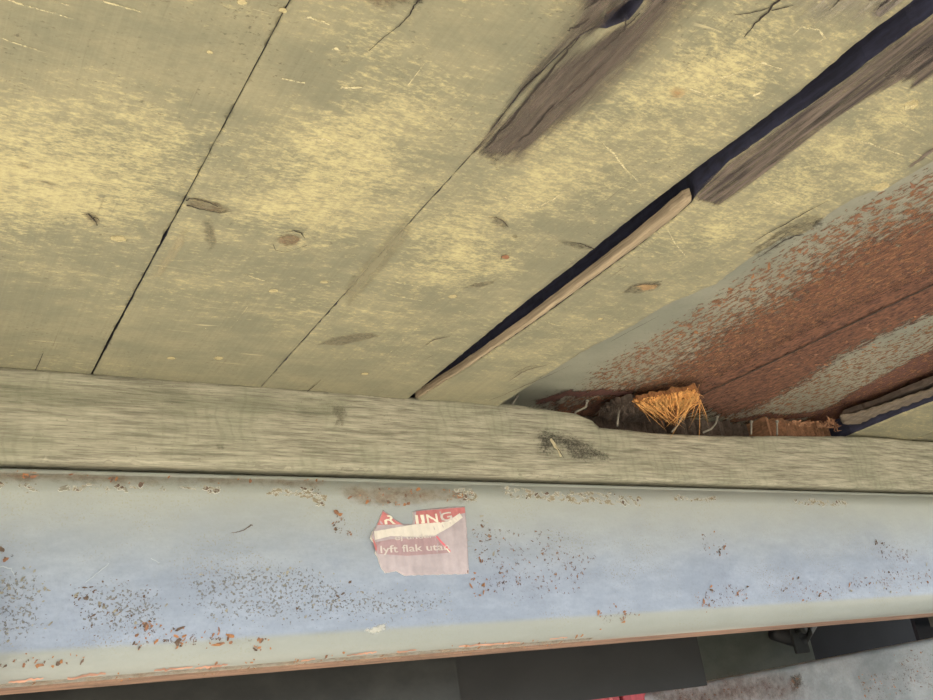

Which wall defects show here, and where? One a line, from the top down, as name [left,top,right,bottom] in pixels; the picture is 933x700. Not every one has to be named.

crack [369,0,420,51]
crack [735,0,793,37]
corrosion [529,168,933,424]
corrosion [0,566,53,647]
corrosion [70,561,455,650]
corrosion [467,515,596,598]
corrosion [781,563,931,602]
corrosion [0,653,228,686]